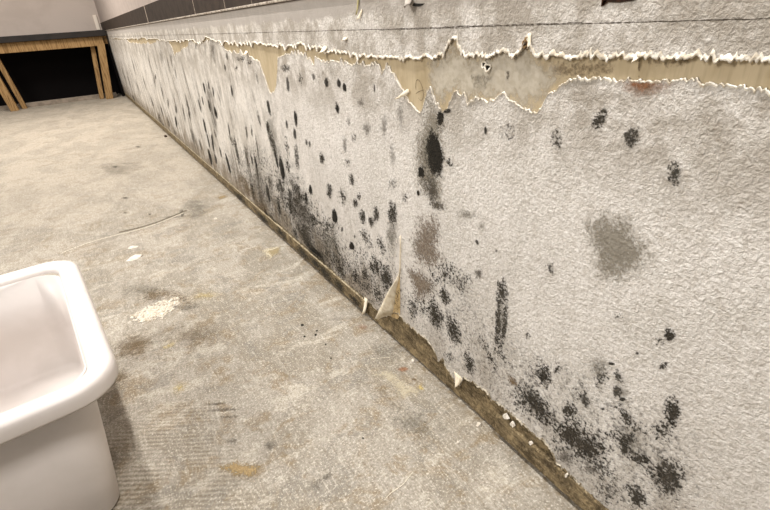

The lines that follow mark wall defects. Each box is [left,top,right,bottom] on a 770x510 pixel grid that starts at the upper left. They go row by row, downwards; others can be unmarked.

peeling [110,34,770,115]
water stain [198,46,576,345]
water stain [592,109,607,129]
water stain [624,127,640,148]
water stain [667,161,681,186]
water stain [585,212,653,279]
peeling [352,235,594,497]
water stain [479,278,686,509]